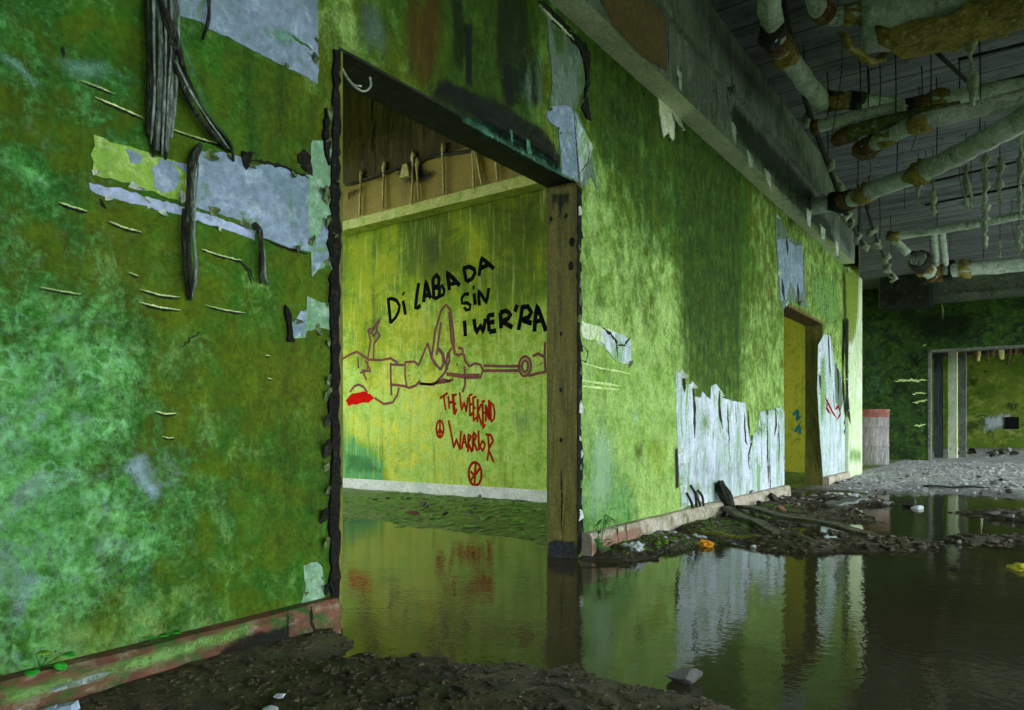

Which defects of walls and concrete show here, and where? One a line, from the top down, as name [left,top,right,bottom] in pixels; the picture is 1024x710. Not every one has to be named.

peeling [89,0,342,603]
peeling [537,0,634,557]
peeling [675,369,786,509]
peeling [817,318,851,477]